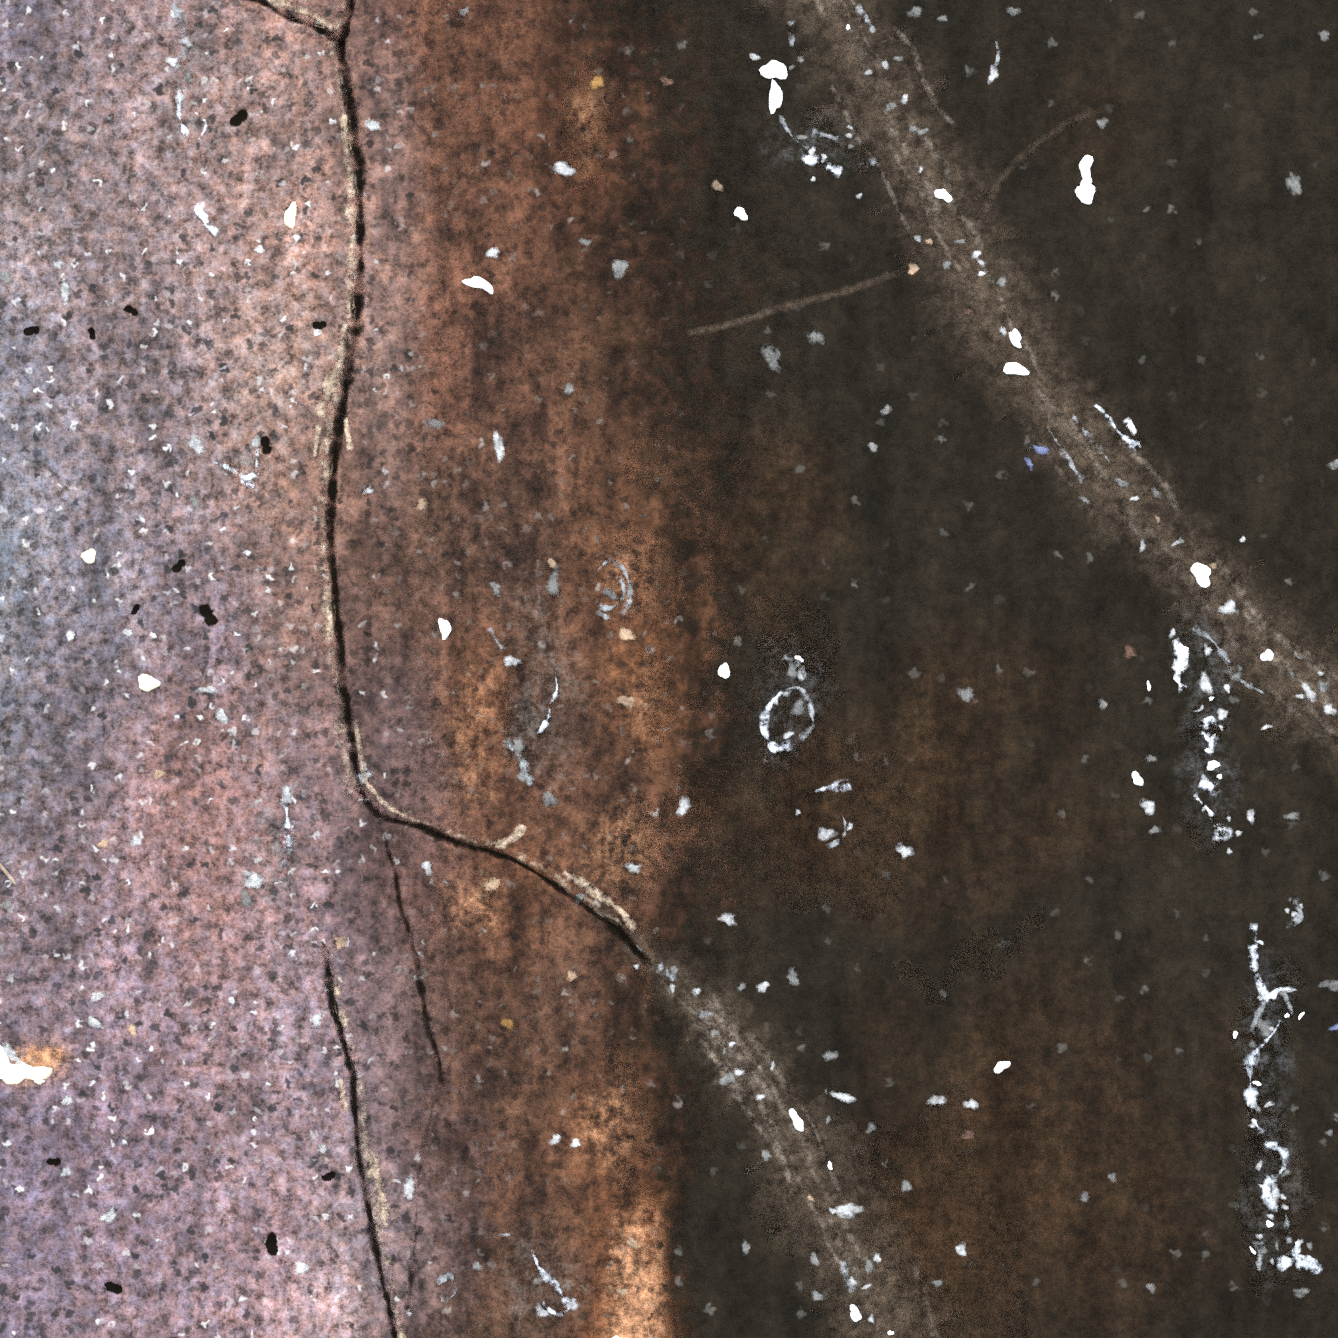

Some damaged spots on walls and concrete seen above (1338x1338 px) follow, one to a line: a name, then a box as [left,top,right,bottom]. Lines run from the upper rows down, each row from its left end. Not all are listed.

crack [250,0,646,1114]
water stain [546,559,558,594]
water stain [489,628,519,665]
rust [322,0,752,1338]
water stain [549,0,1338,1338]
water stain [539,678,558,733]
water stain [507,739,534,785]
water stain [544,792,557,806]
spalling [0,1044,64,1085]
crack [325,965,417,1338]
water stain [438,1273,456,1297]
water stain [533,1255,578,1316]